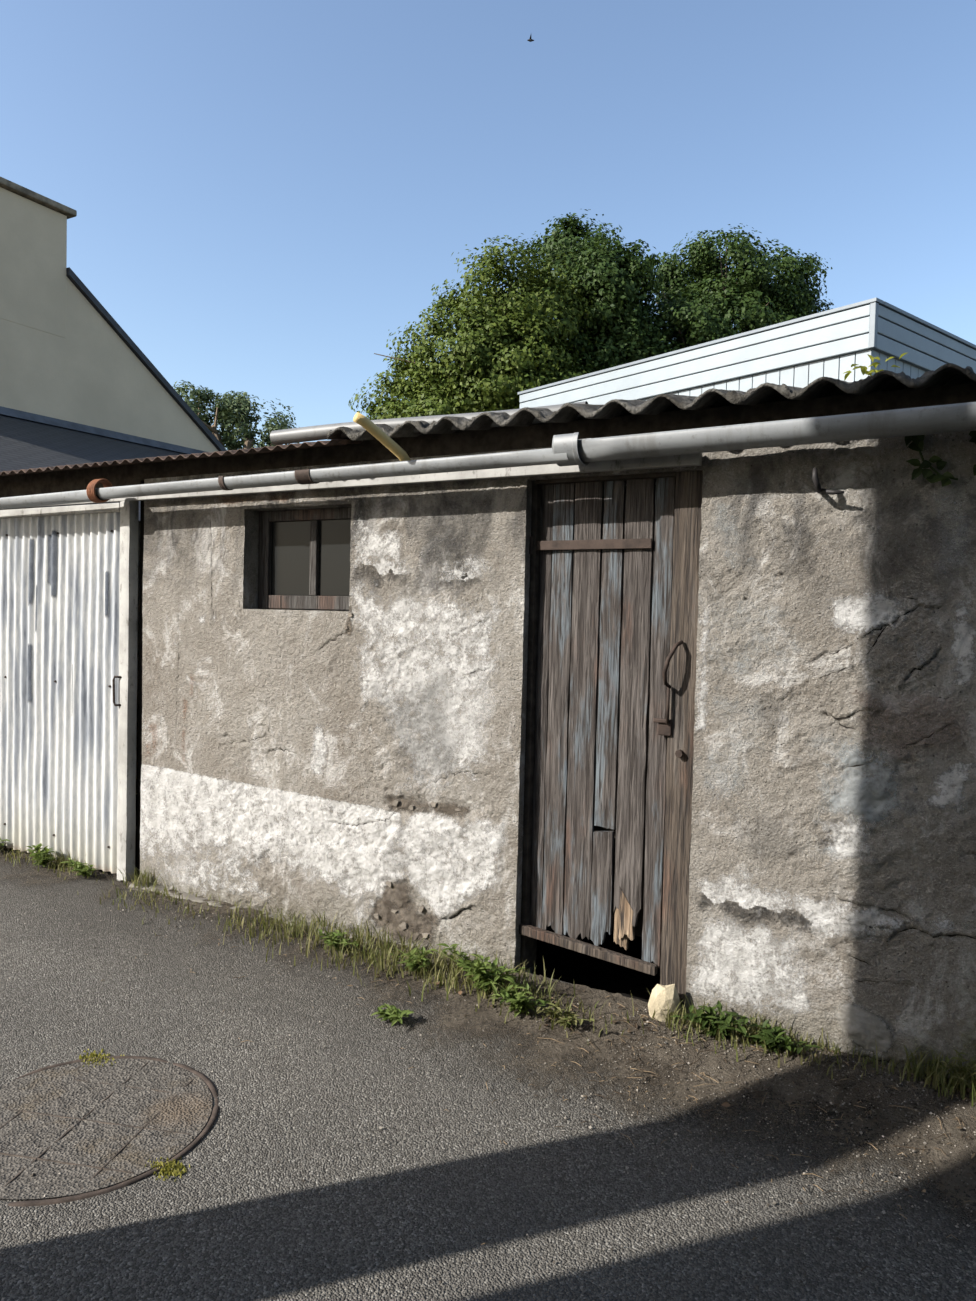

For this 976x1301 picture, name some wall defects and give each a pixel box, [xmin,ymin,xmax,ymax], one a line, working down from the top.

crack [820,595,941,678]
crack [823,710,862,729]
crack [836,895,976,939]